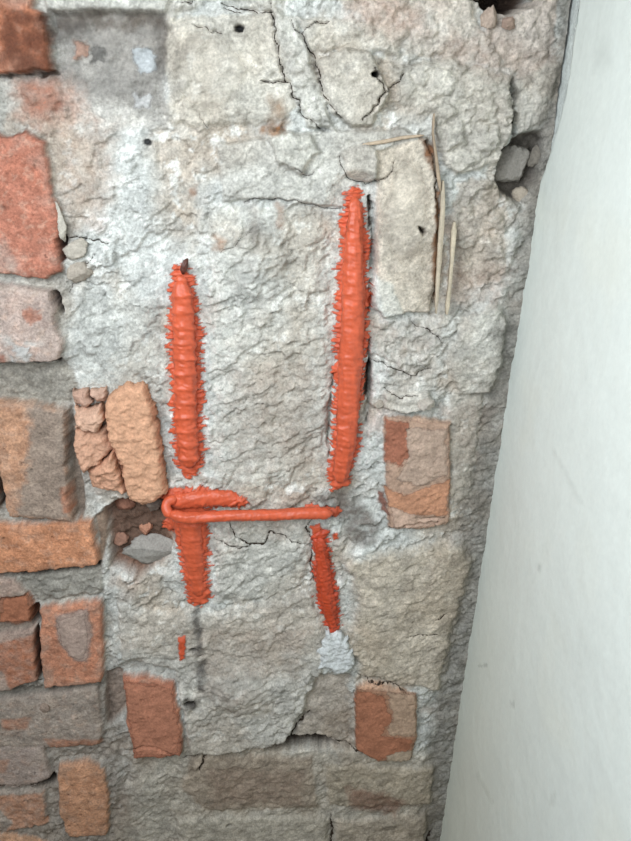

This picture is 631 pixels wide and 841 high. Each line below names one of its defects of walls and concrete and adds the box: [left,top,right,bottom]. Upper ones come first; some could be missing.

spalling [473,0,503,11]
spalling [73,41,105,62]
spalling [132,48,157,73]
crack [221,3,342,129]
spalling [133,93,151,108]
crack [362,67,404,120]
spalling [0,592,40,624]
spalling [56,610,92,661]